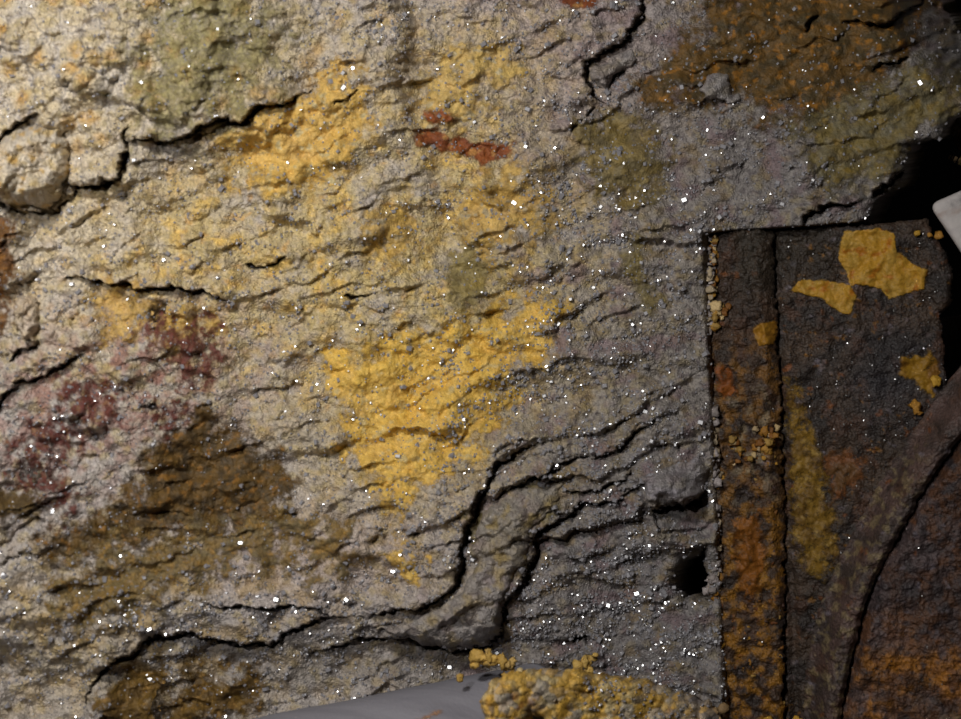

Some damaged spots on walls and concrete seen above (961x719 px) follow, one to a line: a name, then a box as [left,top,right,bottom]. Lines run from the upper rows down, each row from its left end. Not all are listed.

crack [570,1,645,135]
rust [633,0,950,132]
crack [0,112,38,140]
crack [58,90,312,207]
rust [413,109,516,166]
rust [0,217,25,336]
rust [753,321,778,346]
crack [0,340,83,407]
rust [899,352,941,398]
peeling [728,423,781,466]
crack [85,422,655,704]
spalling [692,555,723,610]